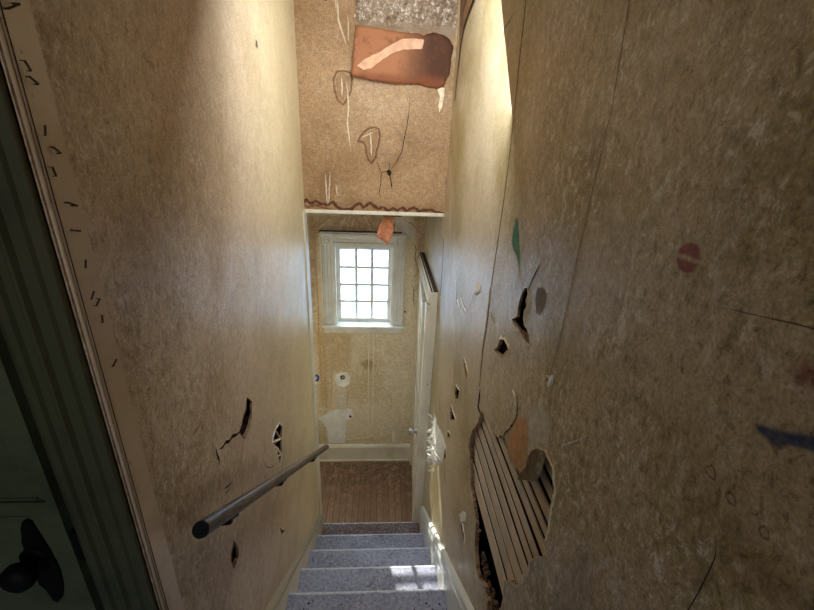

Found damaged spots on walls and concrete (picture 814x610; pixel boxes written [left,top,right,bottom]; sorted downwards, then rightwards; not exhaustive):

flaking render [353,0,458,44]
crack [377,102,410,195]
spalling [511,263,541,343]
crack [723,307,814,329]
flaking render [335,372,350,387]
spalling [492,335,511,375]
spalling [215,397,252,494]
spalling [264,421,283,468]
peeling [426,413,450,472]
spalling [459,390,556,610]
spalling [231,541,239,569]
crack [688,535,716,610]